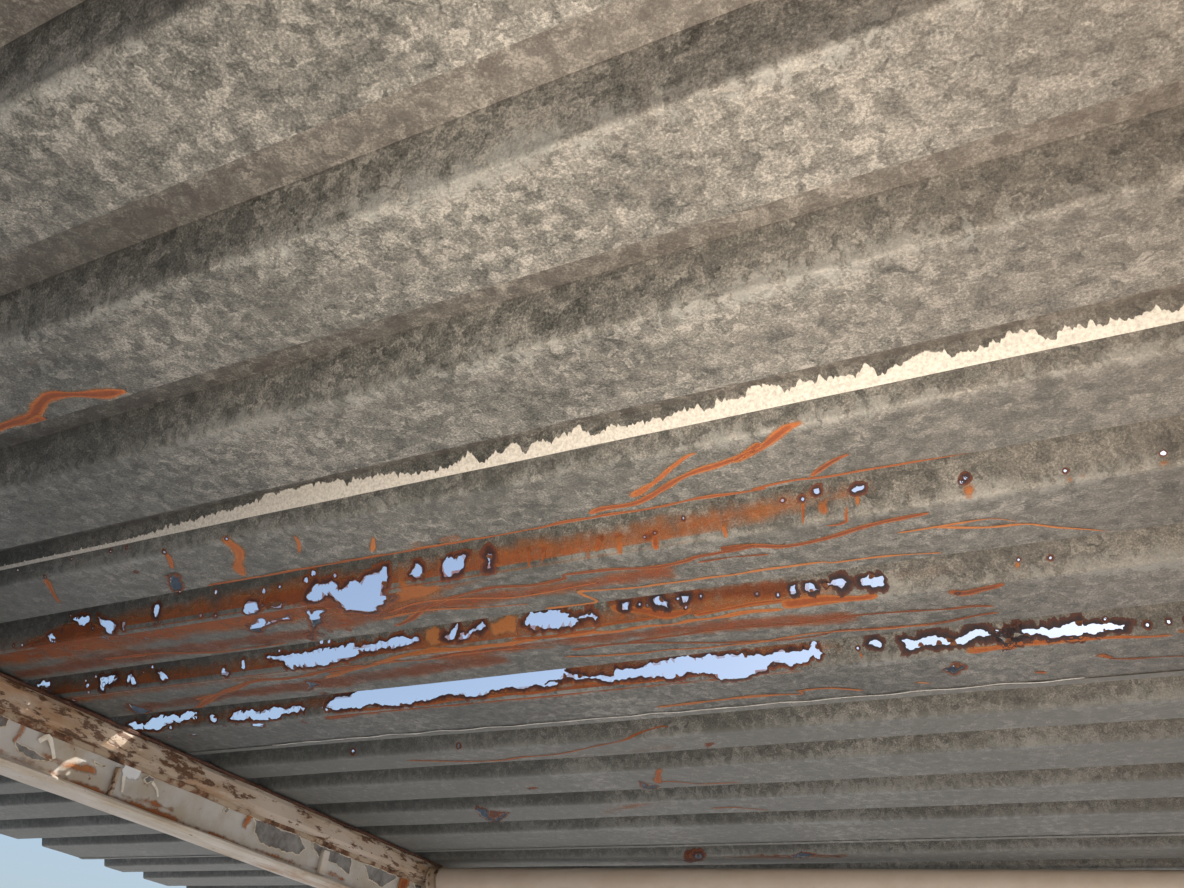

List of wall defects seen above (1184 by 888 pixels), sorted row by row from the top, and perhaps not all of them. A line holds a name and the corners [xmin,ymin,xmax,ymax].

rust [0,389,127,432]
rust [0,421,1102,866]
peeling [918,638,957,647]
rust [967,630,1184,654]
peeling [14,740,51,762]
peeling [253,818,397,888]